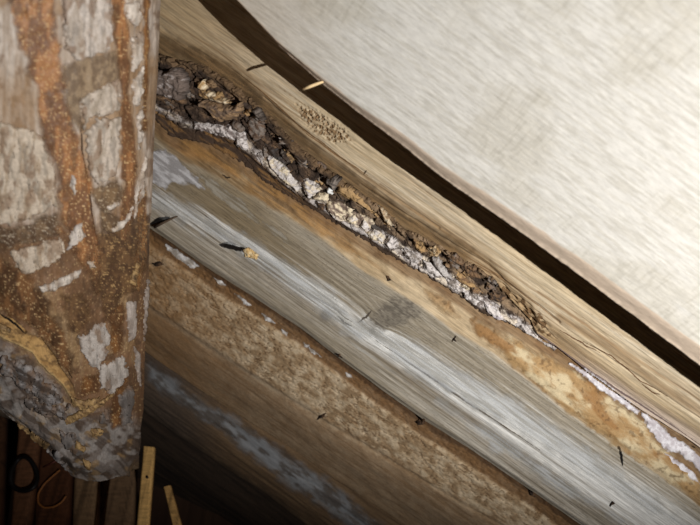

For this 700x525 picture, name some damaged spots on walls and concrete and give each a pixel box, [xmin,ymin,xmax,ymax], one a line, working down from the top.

peeling [156,65,396,231]
leakage [165,244,198,268]
peeling [413,239,507,302]
leakage [151,371,370,525]
leakage [569,363,700,482]